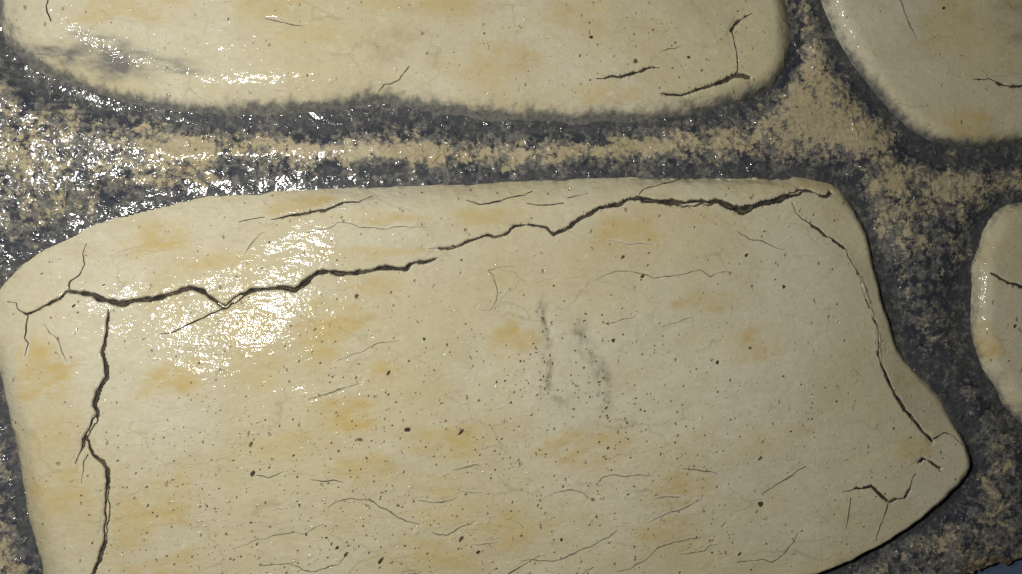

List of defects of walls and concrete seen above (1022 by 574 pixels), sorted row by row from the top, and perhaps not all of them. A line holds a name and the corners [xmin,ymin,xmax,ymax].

crack [596,46,680,79]
crack [660,13,752,96]
crack [973,78,1022,88]
crack [990,273,1022,289]
crack [7,179,962,574]